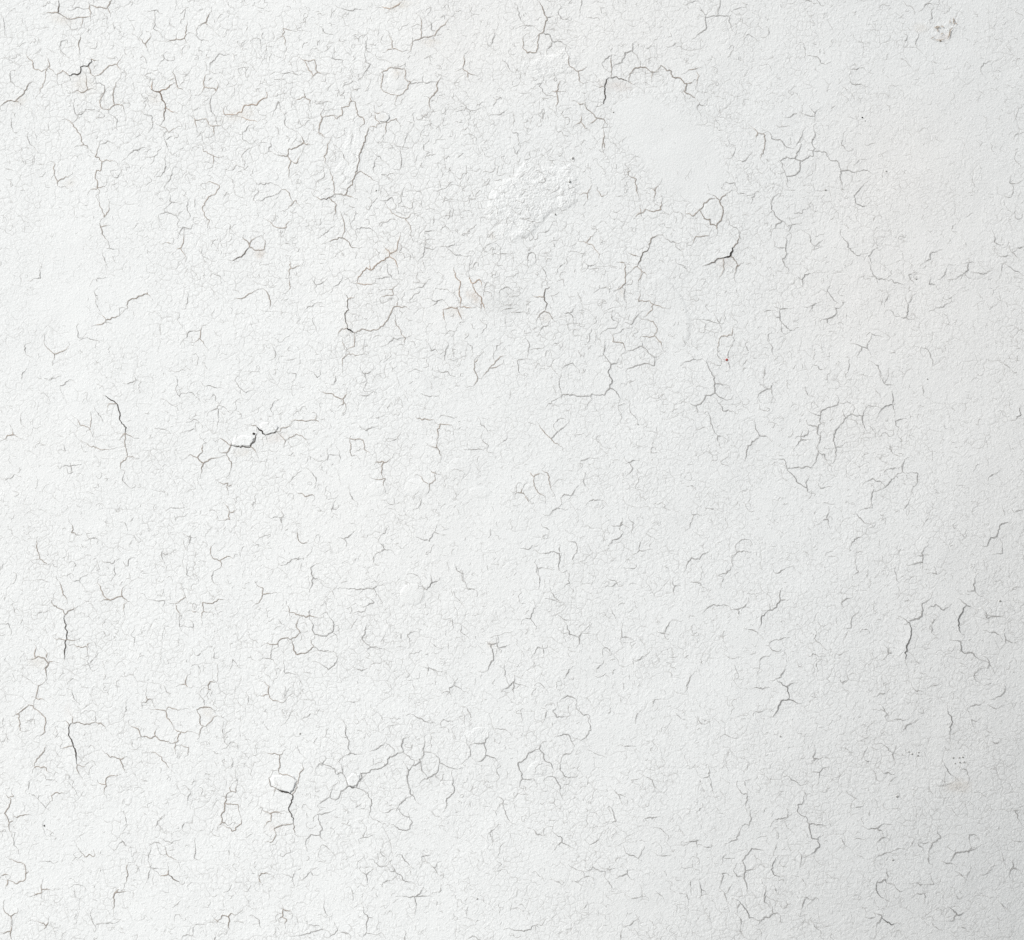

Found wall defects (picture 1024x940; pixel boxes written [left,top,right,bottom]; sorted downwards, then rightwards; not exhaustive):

crack [660,0,769,57]
crack [870,2,951,78]
crack [21,324,124,375]
crack [74,368,143,506]
crack [509,457,645,645]
crack [609,448,669,523]
crack [620,539,838,719]
crack [764,332,1024,790]
crack [0,901,74,940]
crack [453,871,609,940]
crack [568,728,841,940]
crack [839,787,1022,937]